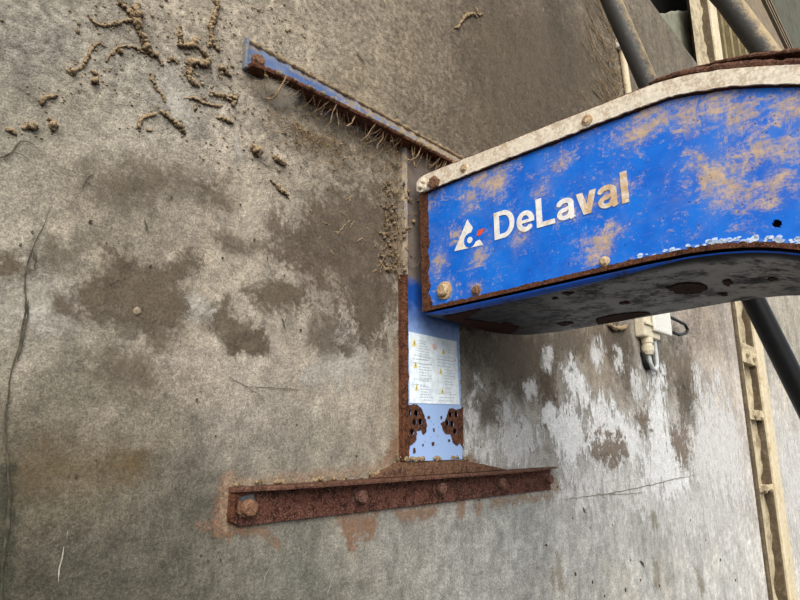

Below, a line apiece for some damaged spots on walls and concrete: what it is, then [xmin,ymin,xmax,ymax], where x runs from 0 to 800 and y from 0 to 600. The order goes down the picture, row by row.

water stain [98,162,231,211]
crack [0,207,52,600]
water stain [53,243,204,352]
water stain [202,294,269,355]
water stain [241,179,399,358]
corrosion [205,339,464,551]
water stain [459,322,636,426]
crack [562,475,696,513]
water stain [652,339,702,424]